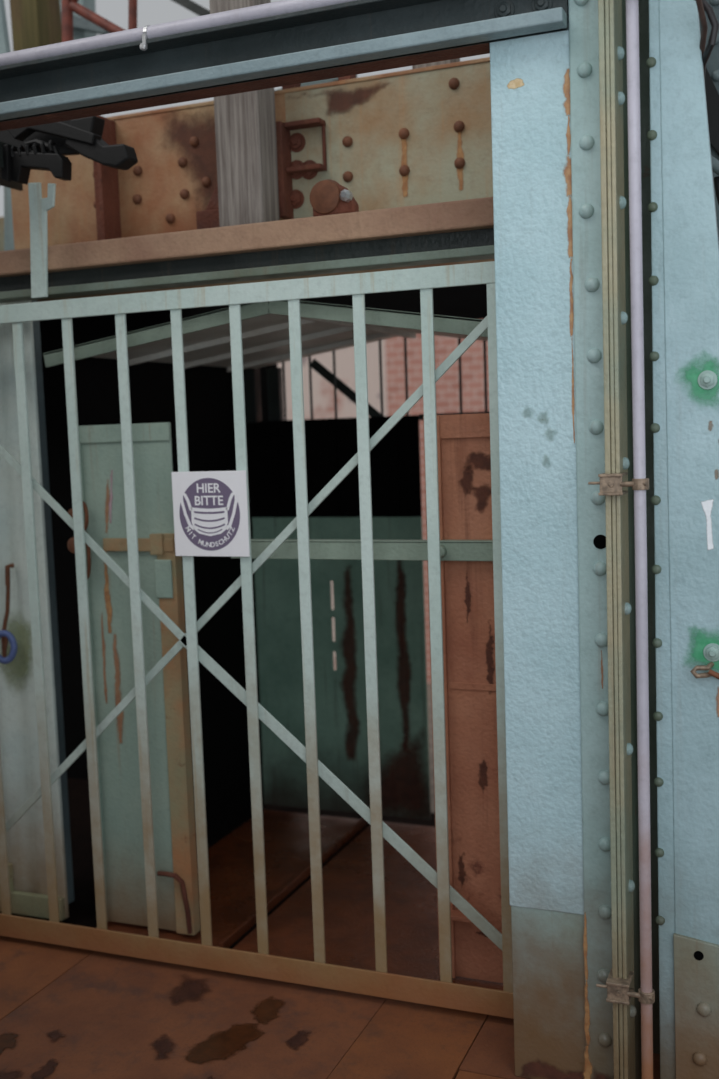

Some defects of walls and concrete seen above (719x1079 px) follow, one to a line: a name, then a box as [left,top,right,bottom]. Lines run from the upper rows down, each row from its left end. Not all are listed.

rust [328,84,386,113]
rust [169,119,218,206]
rust [563,69,575,443]
rust [460,453,491,511]
rust [342,570,360,759]
rust [381,560,426,811]
rust [486,630,495,684]
leakage [170,979,208,1003]
leakage [0,1059,58,1079]
leakage [153,1037,174,1059]
leakage [186,996,284,1064]
leakage [287,1031,310,1050]